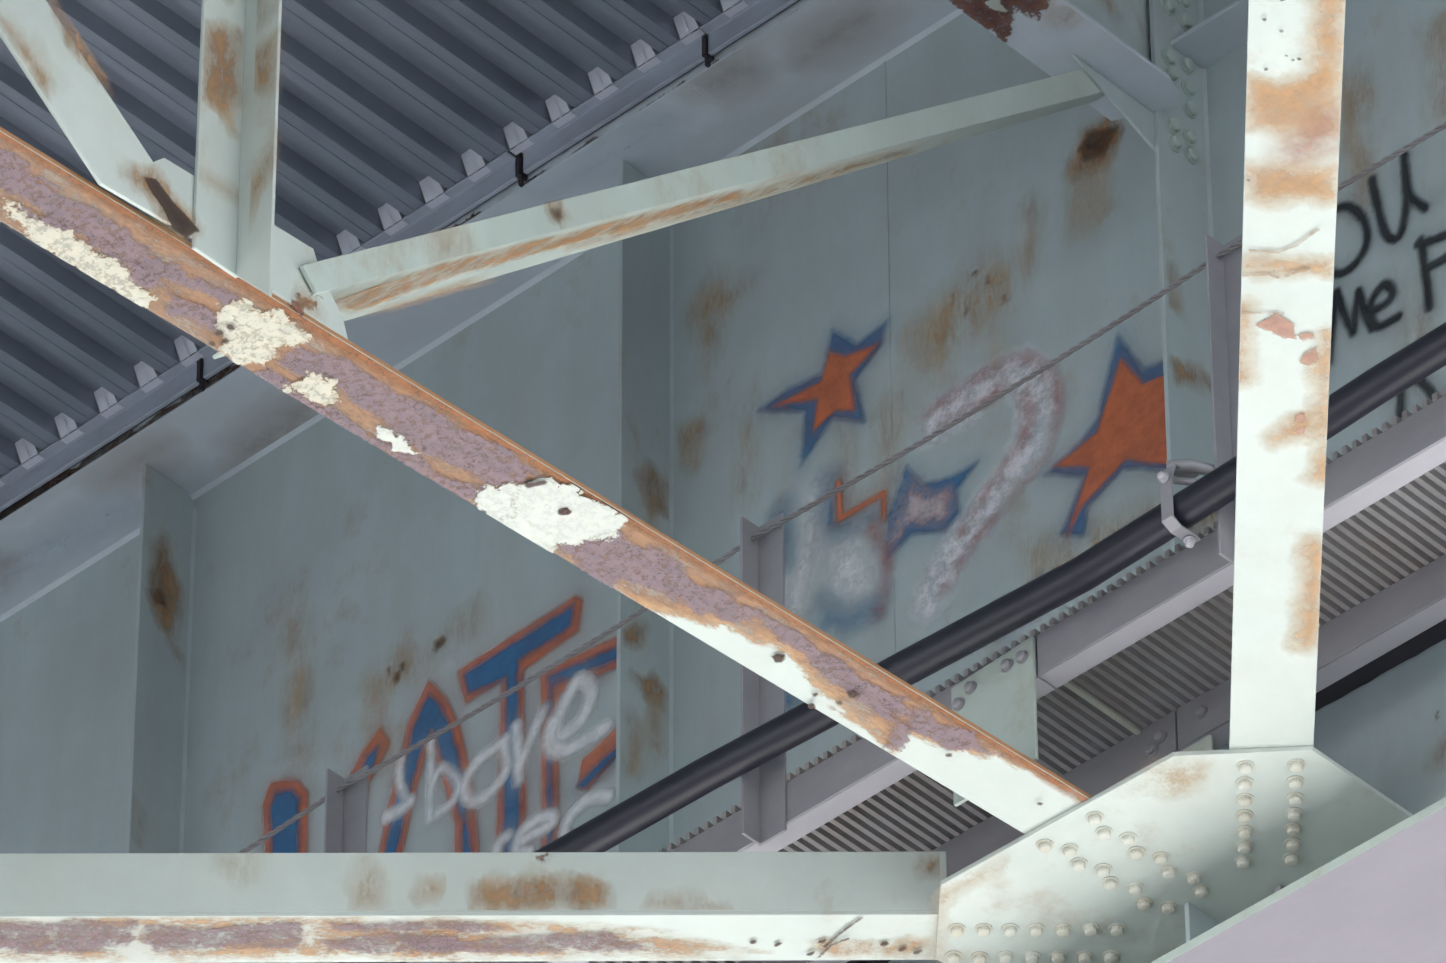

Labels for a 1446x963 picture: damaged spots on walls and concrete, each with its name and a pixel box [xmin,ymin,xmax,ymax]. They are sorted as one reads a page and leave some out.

corrosion [206,28,237,111]
corrosion [1074,118,1122,171]
corrosion [1250,0,1343,200]
peeling [0,149,239,346]
corrosion [1247,261,1327,273]
peeling [254,346,547,501]
corrosion [0,132,1088,802]
corrosion [1239,305,1247,381]
corrosion [1274,332,1331,482]
peeling [559,530,1005,758]
corrosion [1296,543,1322,647]
corrosion [0,880,726,959]